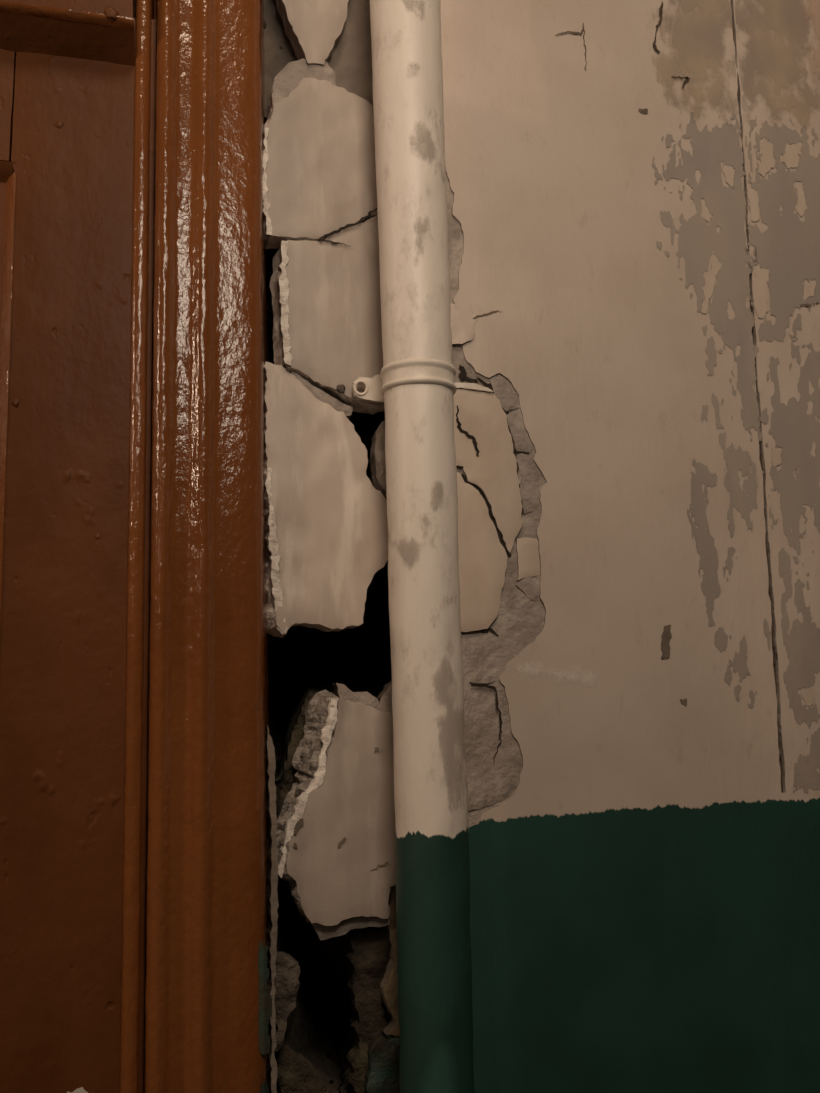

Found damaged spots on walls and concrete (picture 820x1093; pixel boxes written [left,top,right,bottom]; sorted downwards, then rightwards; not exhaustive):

flaking render [263,0,373,173]
crack [557,23,587,70]
crack [318,208,377,247]
flaking render [446,174,463,304]
crack [456,365,530,557]
peeling [652,112,820,794]
flaking render [263,191,400,1093]
crack [466,627,499,637]
crack [471,683,503,760]
flaking render [452,345,547,827]
crack [758,436,783,792]